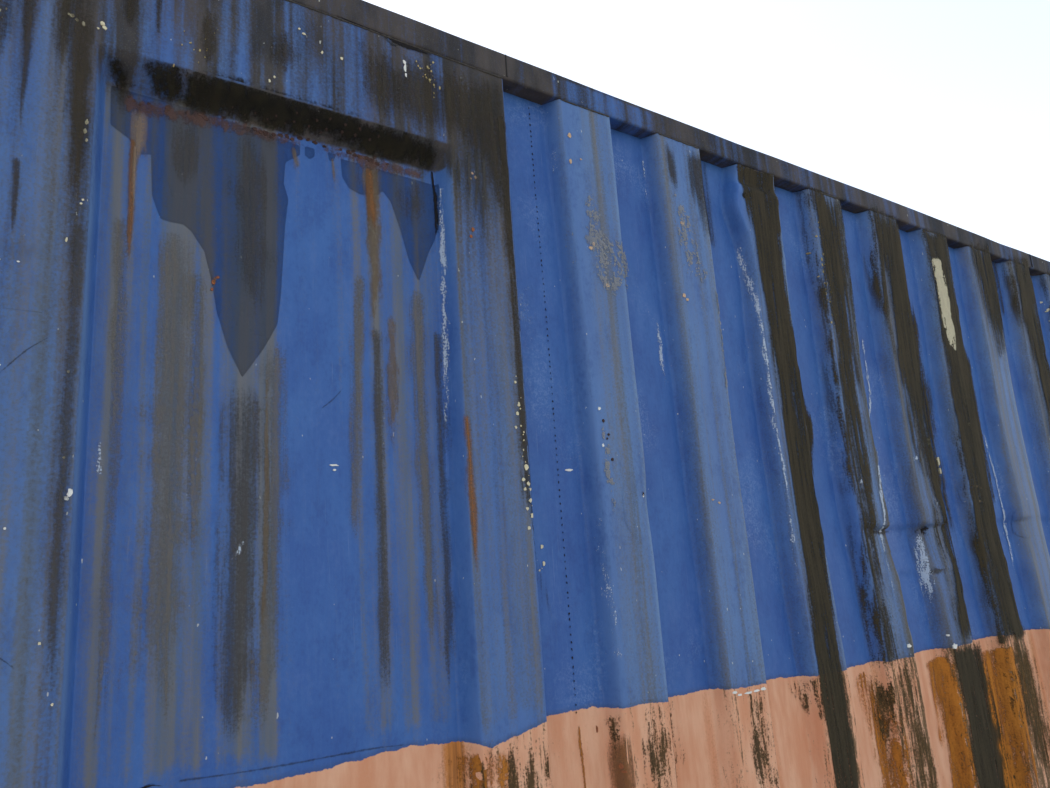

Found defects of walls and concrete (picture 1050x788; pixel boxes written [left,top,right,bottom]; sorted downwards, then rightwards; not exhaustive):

rust [125,96,420,317]
leakage [145,51,535,545]
leakage [350,279,398,677]
leakage [737,164,859,788]
leakage [800,188,898,666]
peeling [932,259,956,350]
leakage [868,208,1026,788]
leakage [971,242,1050,424]
rust [610,740,636,788]
rust [857,672,912,788]
rust [927,657,979,788]
rust [983,637,1050,788]